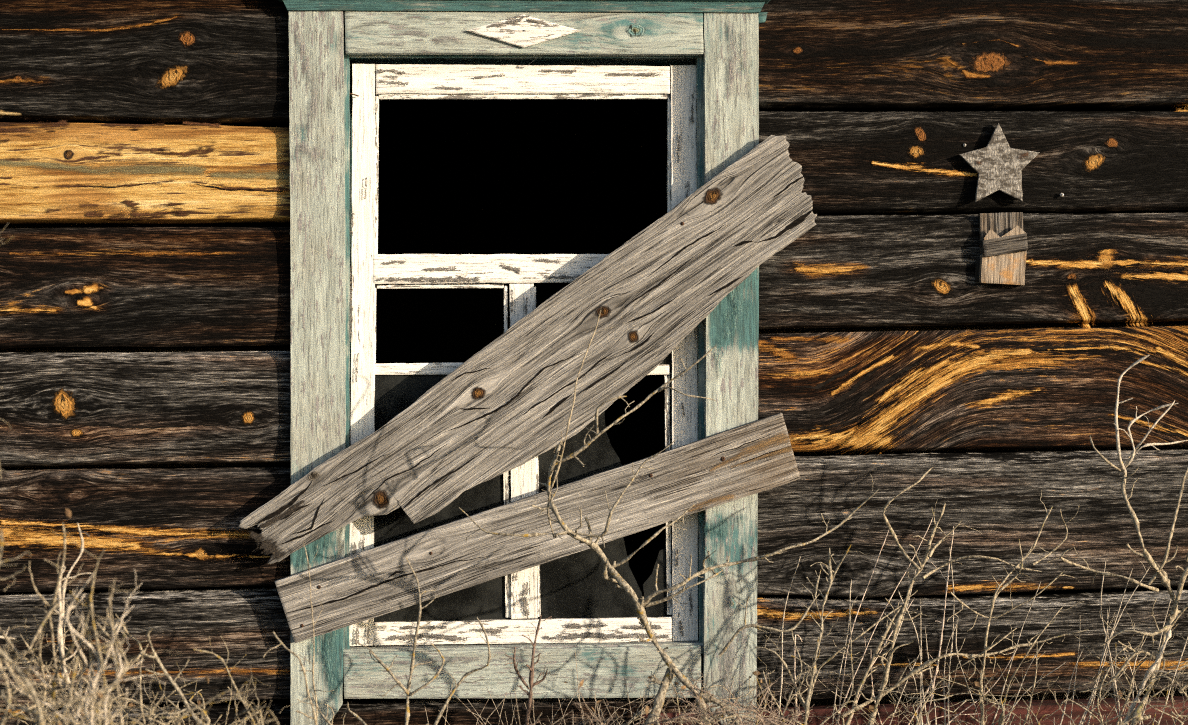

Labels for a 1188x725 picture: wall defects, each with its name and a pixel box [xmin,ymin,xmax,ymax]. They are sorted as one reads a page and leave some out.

peeling [377,68,409,85]
crack [773,175,806,198]
crack [254,209,814,544]
peeling [543,589,693,641]
peeling [388,625,502,643]